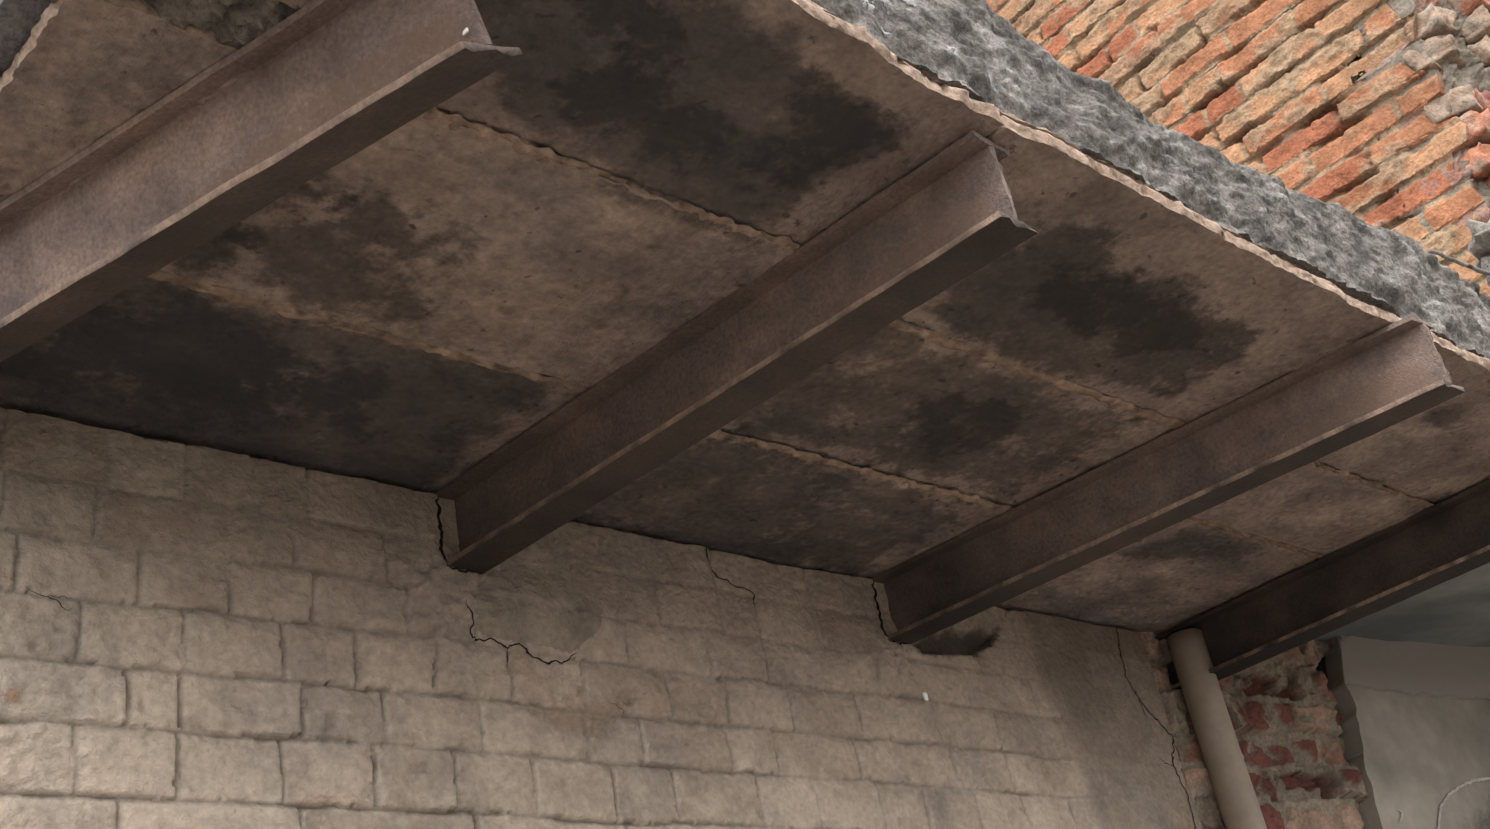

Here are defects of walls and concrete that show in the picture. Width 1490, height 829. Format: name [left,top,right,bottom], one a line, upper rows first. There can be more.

crack [435,497,576,665]
flaking render [1139,632,1226,829]
flaking render [1218,639,1368,829]